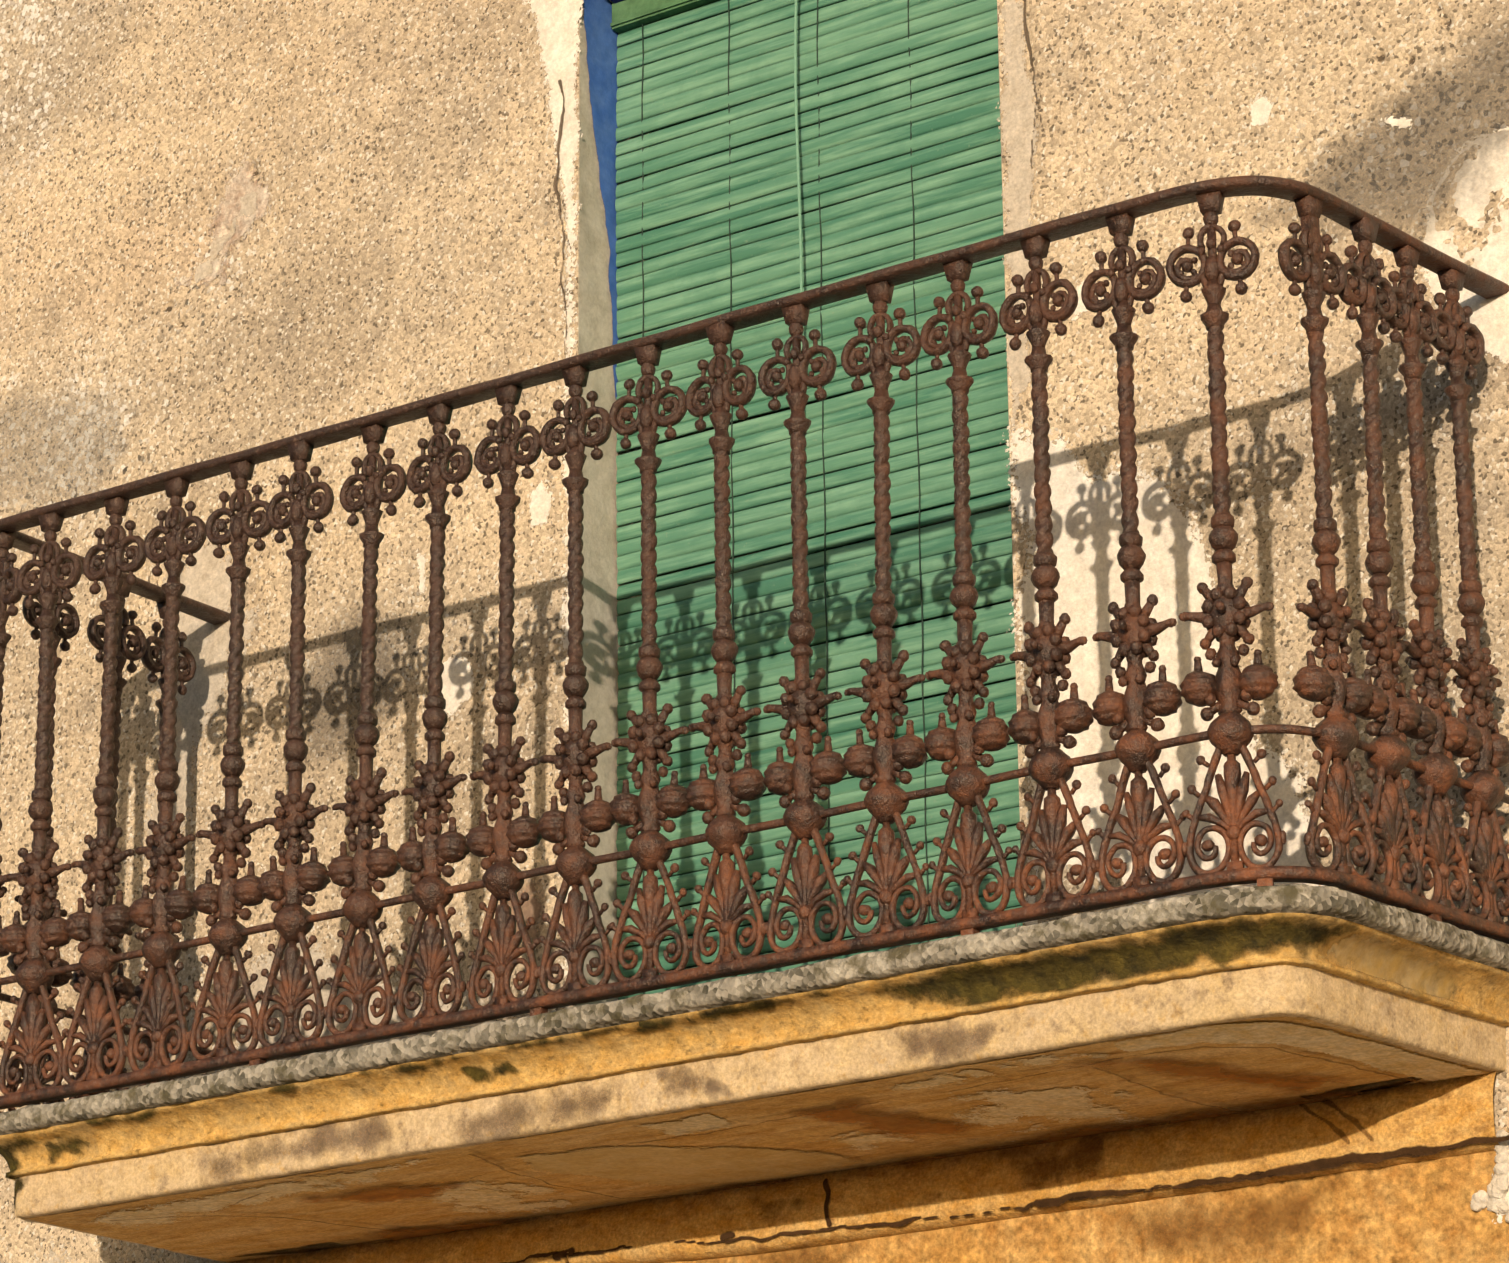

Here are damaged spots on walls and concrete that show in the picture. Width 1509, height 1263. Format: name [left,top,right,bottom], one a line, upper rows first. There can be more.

flaking render [1380,112,1412,130]
crack [674,1098,1509,1245]
crack [502,1245,632,1263]